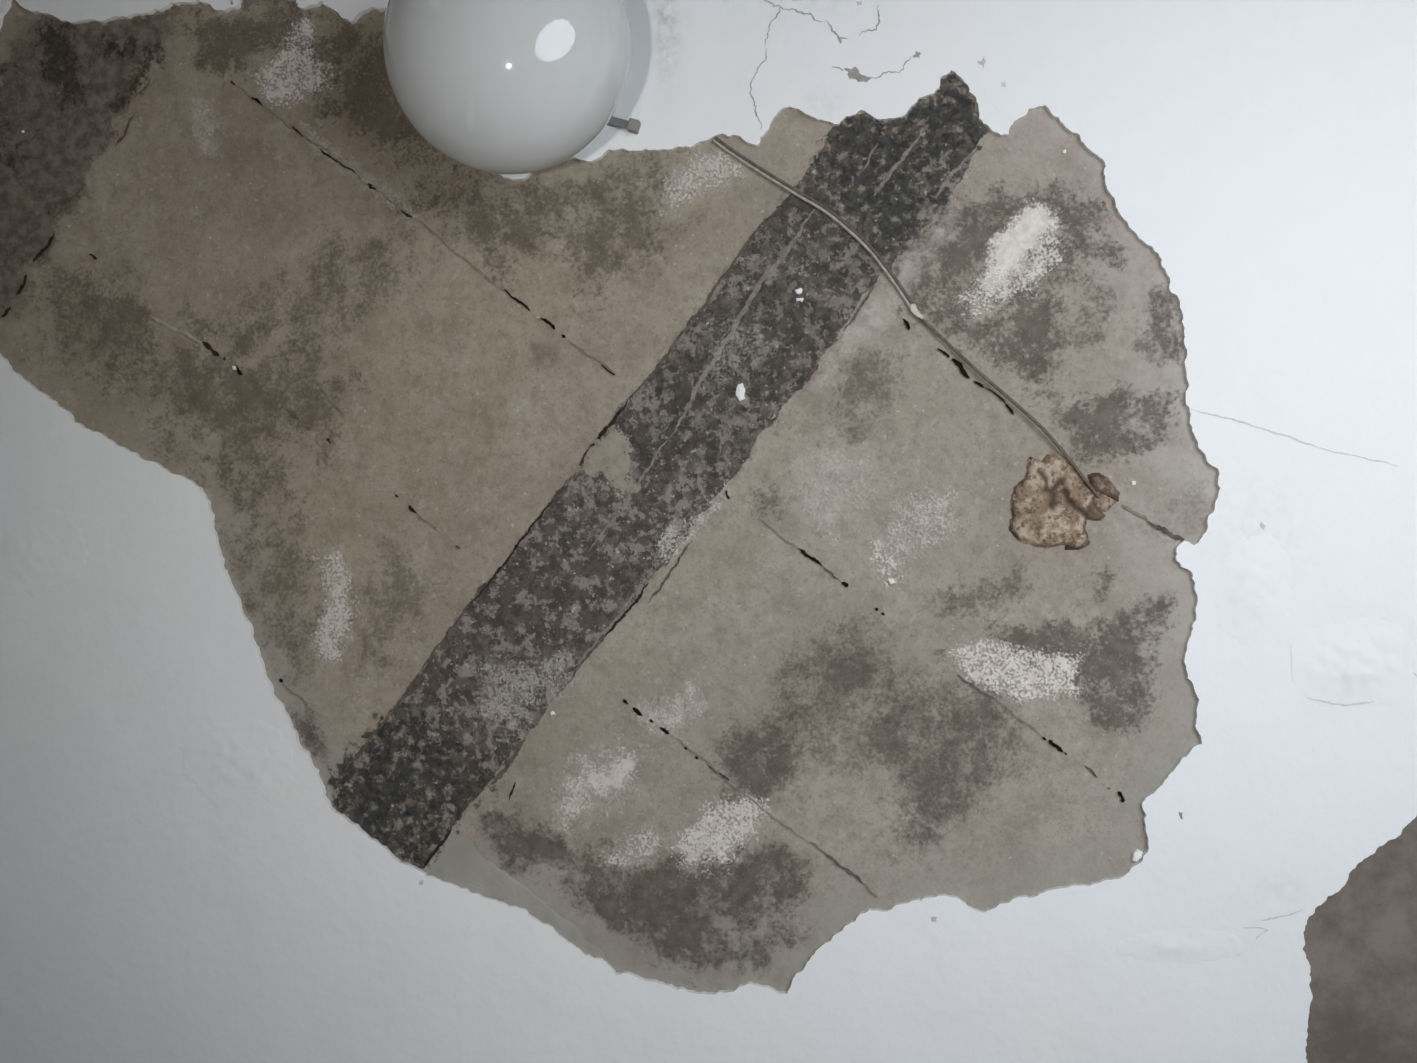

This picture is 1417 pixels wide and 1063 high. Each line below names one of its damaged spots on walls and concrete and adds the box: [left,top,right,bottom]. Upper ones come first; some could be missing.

crack [230,81,616,375]
damp [194,0,745,294]
crack [750,0,911,130]
damp [810,75,1125,397]
damp [245,542,359,664]
peeling [0,0,883,871]
damp [328,681,811,969]
crack [623,699,878,898]
peeling [424,74,1219,993]
damp [868,596,1175,840]
damp [1055,388,1177,463]
peeling [1303,816,1417,1063]